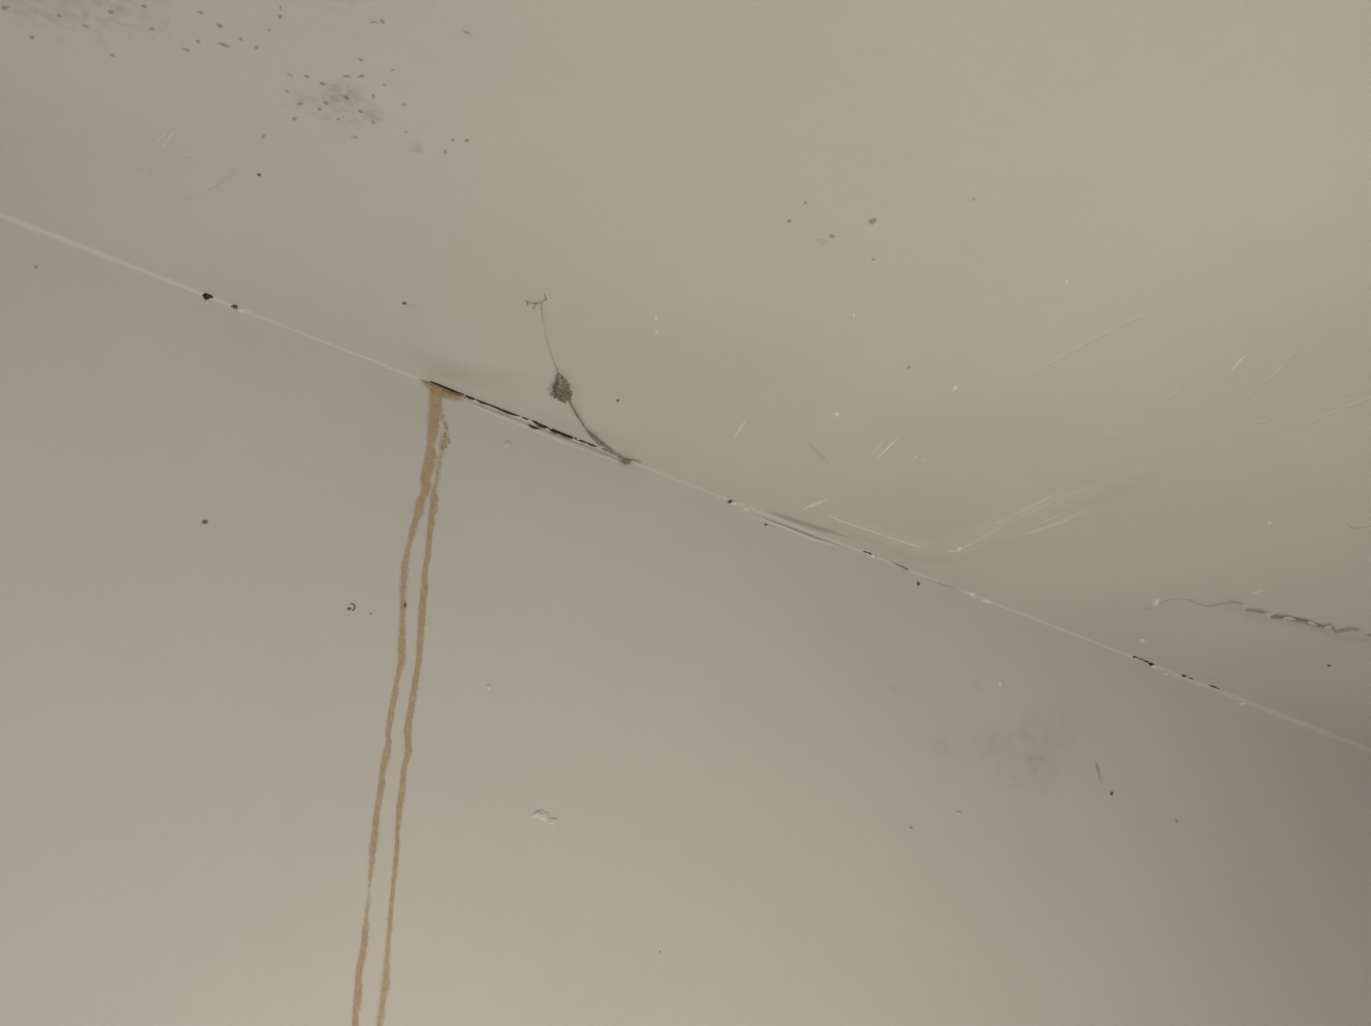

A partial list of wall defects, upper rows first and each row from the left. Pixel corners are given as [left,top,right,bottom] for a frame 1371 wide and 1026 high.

crack [427,381,623,463]
water stain [369,385,457,1026]
water stain [352,909,368,1026]